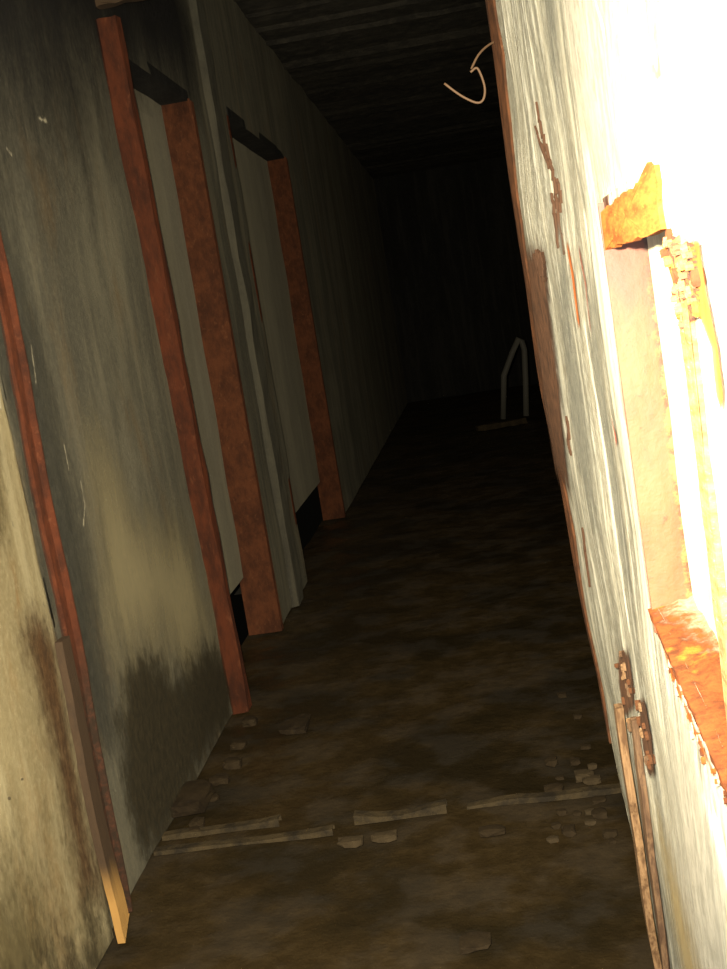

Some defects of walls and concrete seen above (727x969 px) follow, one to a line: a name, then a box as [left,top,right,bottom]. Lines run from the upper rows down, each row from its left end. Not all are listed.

rust [659,228,724,412]